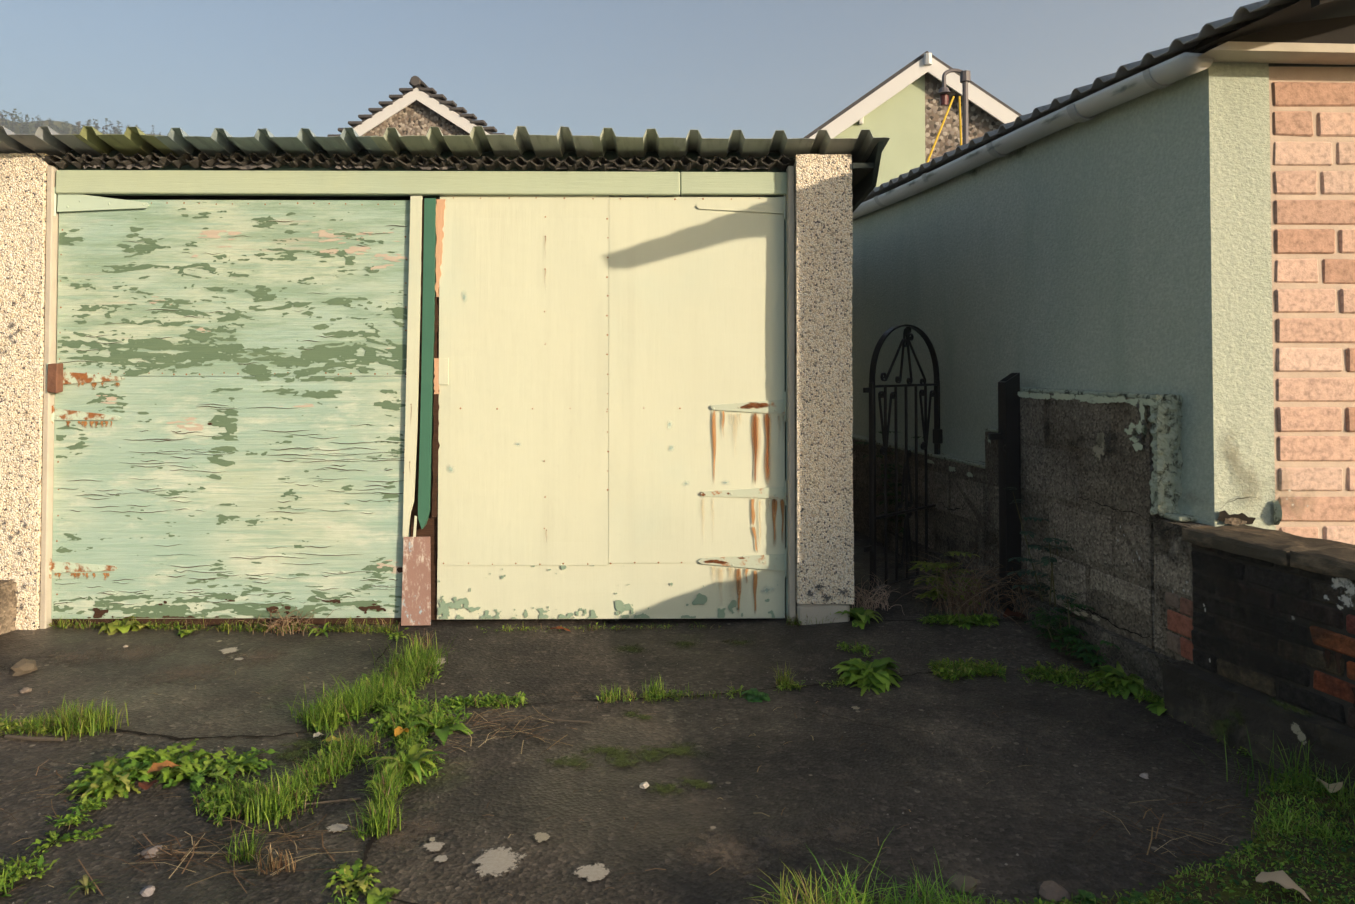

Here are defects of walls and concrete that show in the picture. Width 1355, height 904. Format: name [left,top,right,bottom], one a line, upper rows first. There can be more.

peeling [56,202,407,502]
rust [712,411,725,477]
rust [740,402,770,482]
peeling [56,533,105,553]
peeling [53,540,402,618]
peeling [200,476,302,535]
peeling [438,580,598,619]
peeling [615,569,650,618]
peeling [681,585,743,618]
rust [704,499,757,611]
rust [772,499,784,543]
crack [345,826,376,904]